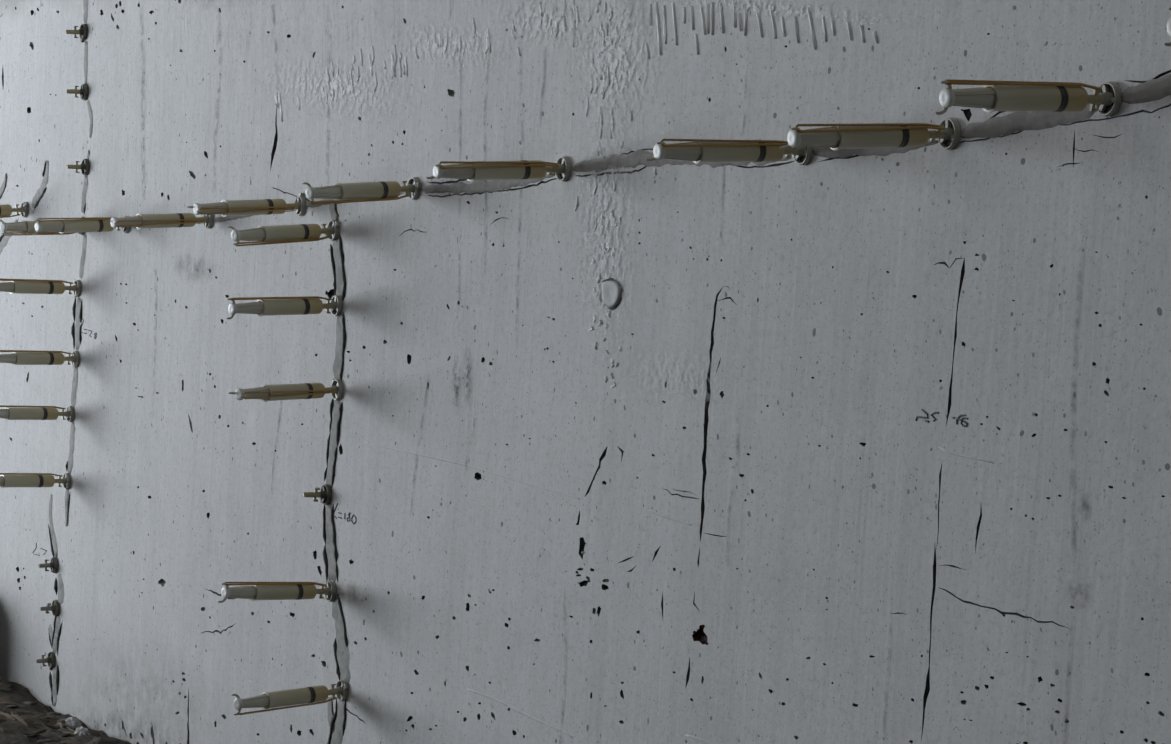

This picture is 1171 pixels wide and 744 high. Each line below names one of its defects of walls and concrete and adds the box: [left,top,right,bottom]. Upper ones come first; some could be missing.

crack [0,160,49,254]
damp [274,18,491,122]
damp [511,0,878,388]
crack [400,70,1171,223]
crack [48,0,93,706]
crack [270,88,366,744]
crack [576,446,624,525]
crack [663,286,737,610]
crack [932,258,965,425]
crack [200,589,236,634]
crack [684,657,692,686]
crack [892,464,1069,739]